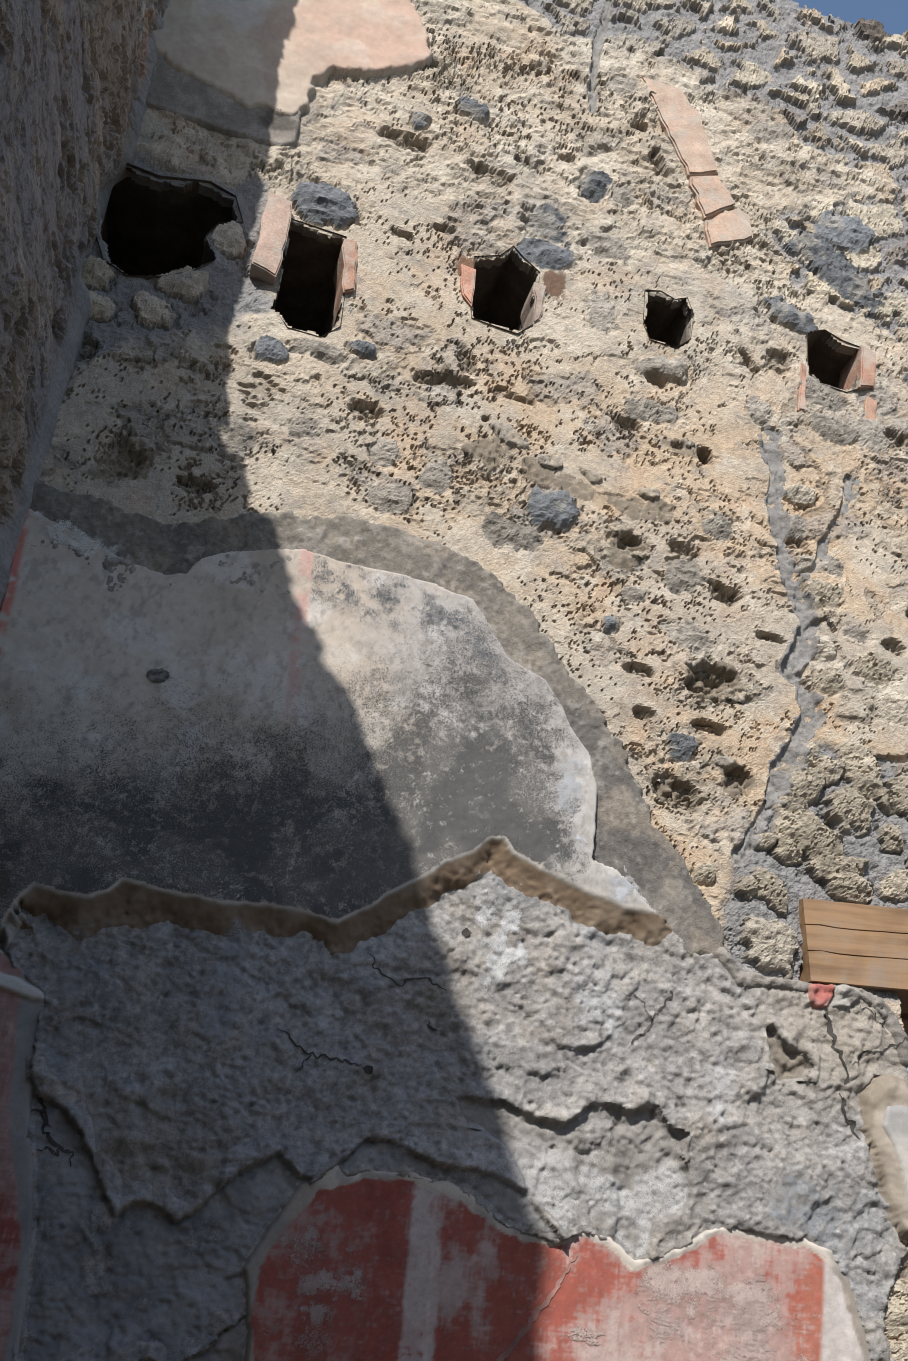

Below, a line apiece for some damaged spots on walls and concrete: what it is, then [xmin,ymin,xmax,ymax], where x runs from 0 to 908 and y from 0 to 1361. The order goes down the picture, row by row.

spalling [146,668,170,683]
spalling [684,657,749,704]
spalling [646,770,692,810]
spalling [714,755,758,798]
crack [624,987,677,1046]
flaking render [807,984,835,1009]
crack [277,1027,362,1074]
flaking render [763,1014,821,1082]
crack [823,1005,907,1139]
flaking render [21,1055,369,1361]
flaking render [341,1082,814,1361]
crack [496,1255,578,1361]